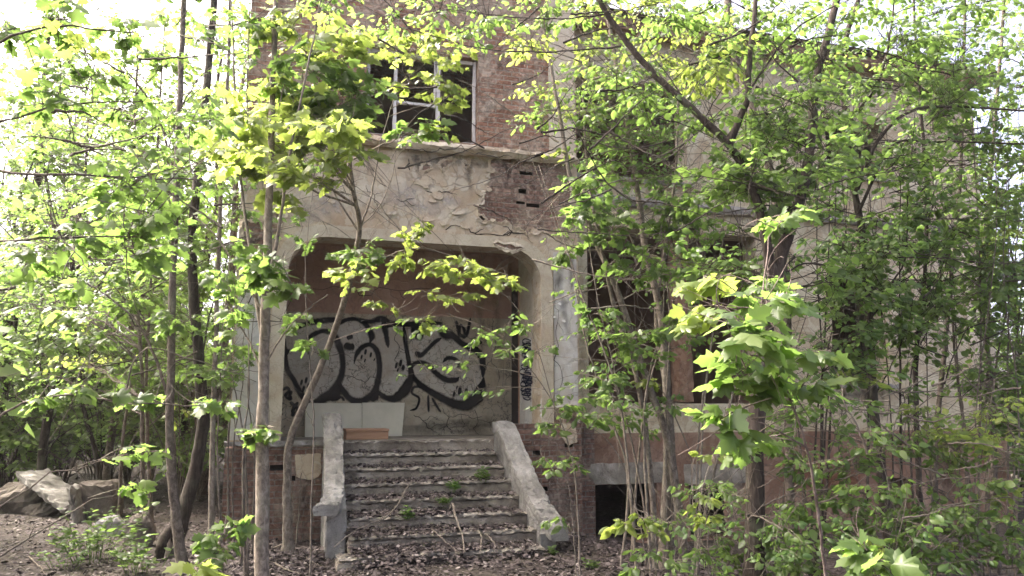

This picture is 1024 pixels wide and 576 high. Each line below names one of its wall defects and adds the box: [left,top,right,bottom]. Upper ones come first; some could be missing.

spalling [412,156,575,254]